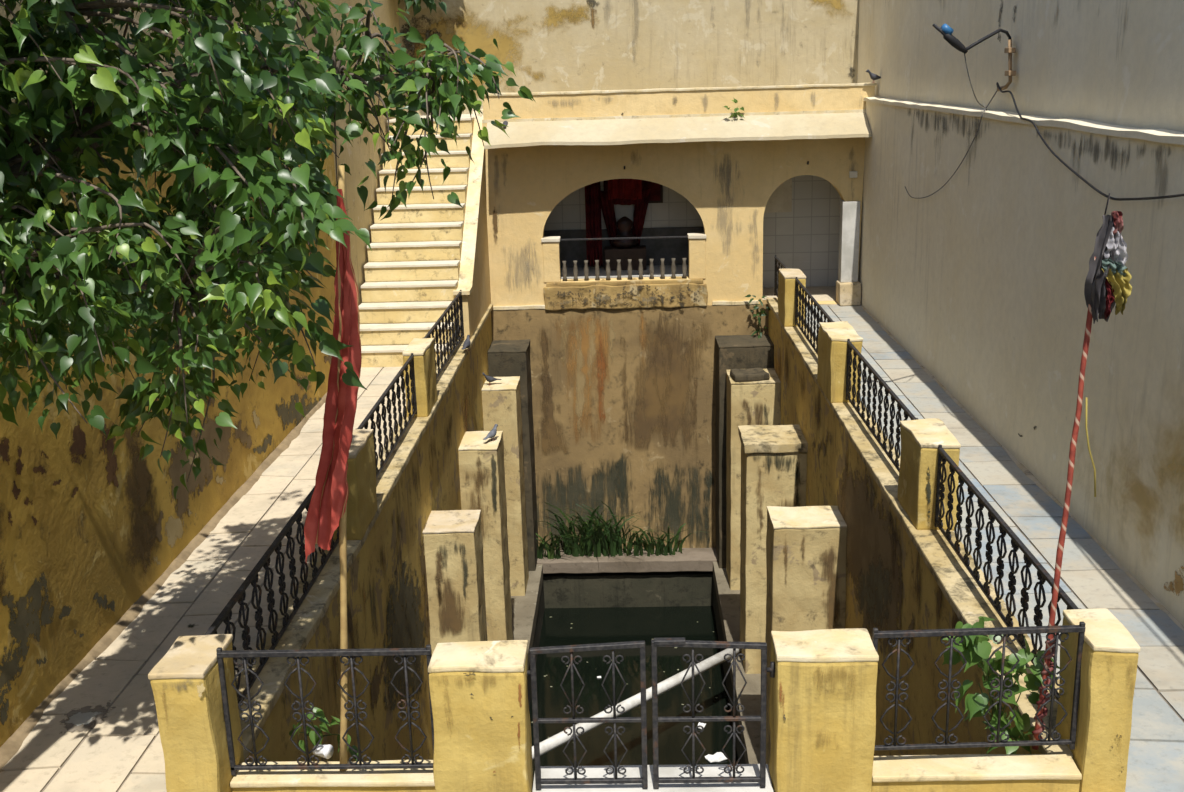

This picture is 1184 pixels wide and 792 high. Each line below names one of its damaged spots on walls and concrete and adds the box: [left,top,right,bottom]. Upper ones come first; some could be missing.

crack [997,0,1016,43]
damp [1037,133,1123,164]
spalling [0,437,61,526]
spalling [69,424,119,487]
damp [538,331,567,455]
damp [560,318,615,437]
damp [614,315,706,526]
damp [648,465,714,548]
damp [436,545,469,634]
damp [823,548,840,629]
peeling [1164,566,1184,596]
peeling [0,572,72,725]